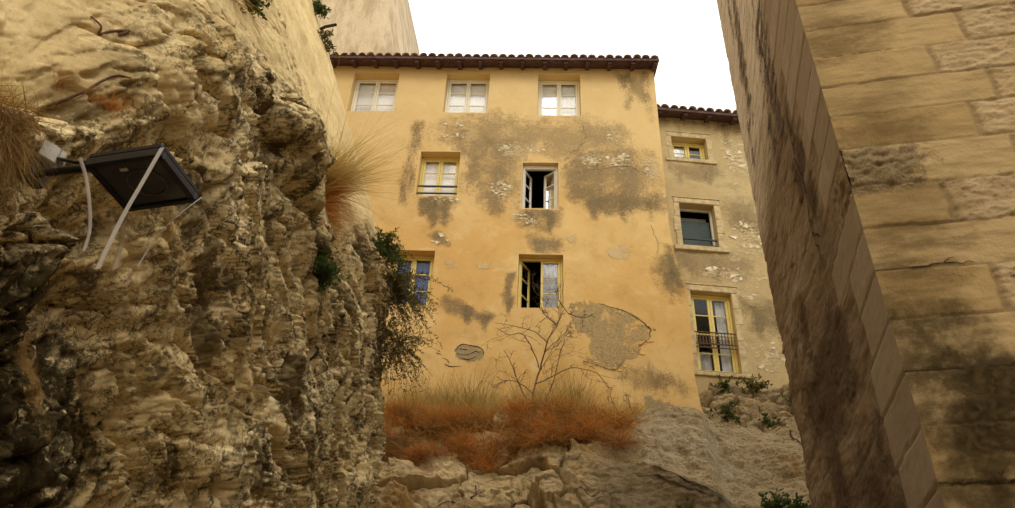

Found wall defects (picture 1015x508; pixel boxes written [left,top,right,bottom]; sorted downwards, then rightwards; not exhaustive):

water stain [443,114,661,219]
water stain [654,246,749,293]
spalling [694,0,945,508]
crack [875,257,973,271]
flaking render [455,345,484,362]
flaking render [570,299,656,371]
water stain [887,300,1015,508]